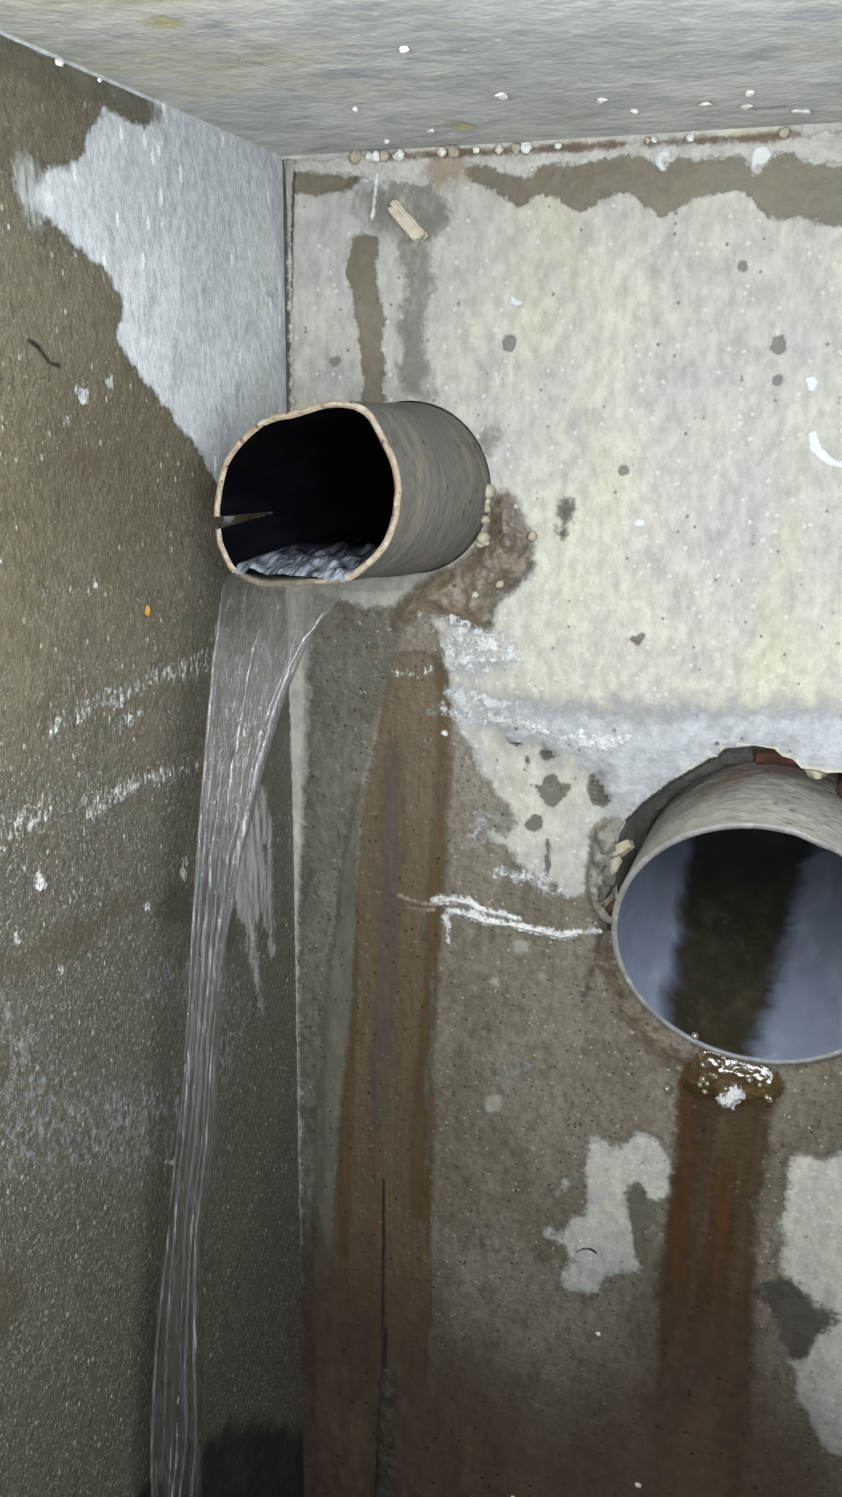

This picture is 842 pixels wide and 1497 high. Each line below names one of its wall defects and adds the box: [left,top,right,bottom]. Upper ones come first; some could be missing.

water stain [292,171,449,403]
water stain [464,146,842,226]
water stain [0,35,288,1497]
water stain [201,595,842,1497]
crack [379,1179,387,1345]
corrosion [656,1079,775,1402]